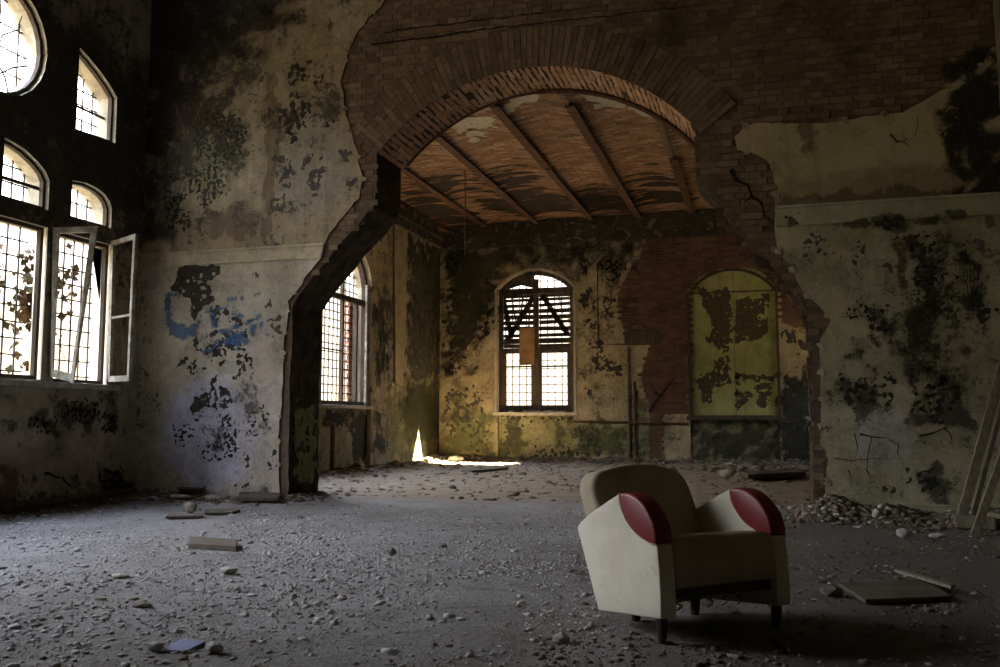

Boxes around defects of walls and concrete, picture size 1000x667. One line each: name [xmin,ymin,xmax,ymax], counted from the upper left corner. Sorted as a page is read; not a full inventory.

peeling [273,60,335,144]
leakage [933,46,1000,195]
peeling [268,153,327,215]
crack [729,169,775,225]
spalling [311,0,996,495]
peeling [170,264,282,488]
peeling [264,299,291,338]
leakage [369,232,601,458]
leakage [578,287,630,377]
leakage [834,209,999,432]
crack [834,425,958,484]
leakage [882,460,949,514]